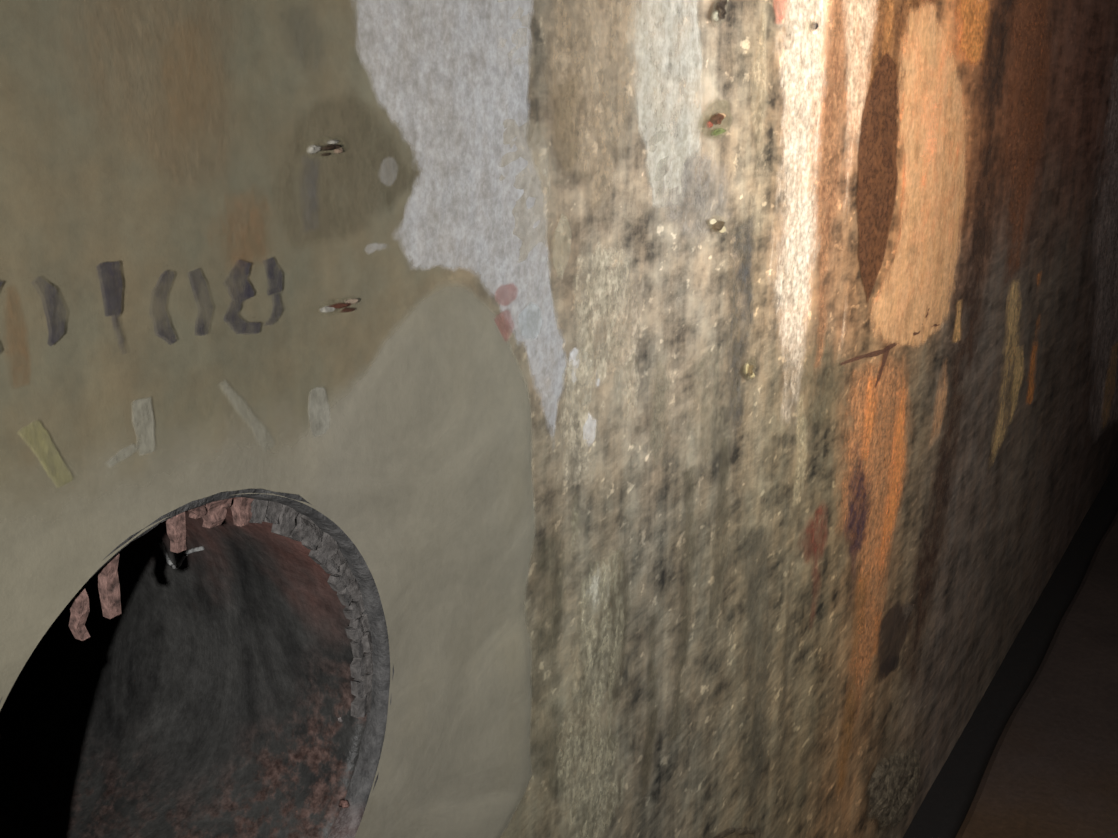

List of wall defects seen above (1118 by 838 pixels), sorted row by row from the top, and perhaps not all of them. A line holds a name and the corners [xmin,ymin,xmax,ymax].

spalling [309,140,343,156]
spalling [321,299,359,312]
peeling [359,0,566,429]
water stain [564,247,638,468]
water stain [664,154,723,233]
water stain [728,221,753,422]
water stain [778,0,825,358]
water stain [846,0,875,128]
corrosion [844,364,907,686]
water stain [549,553,629,838]